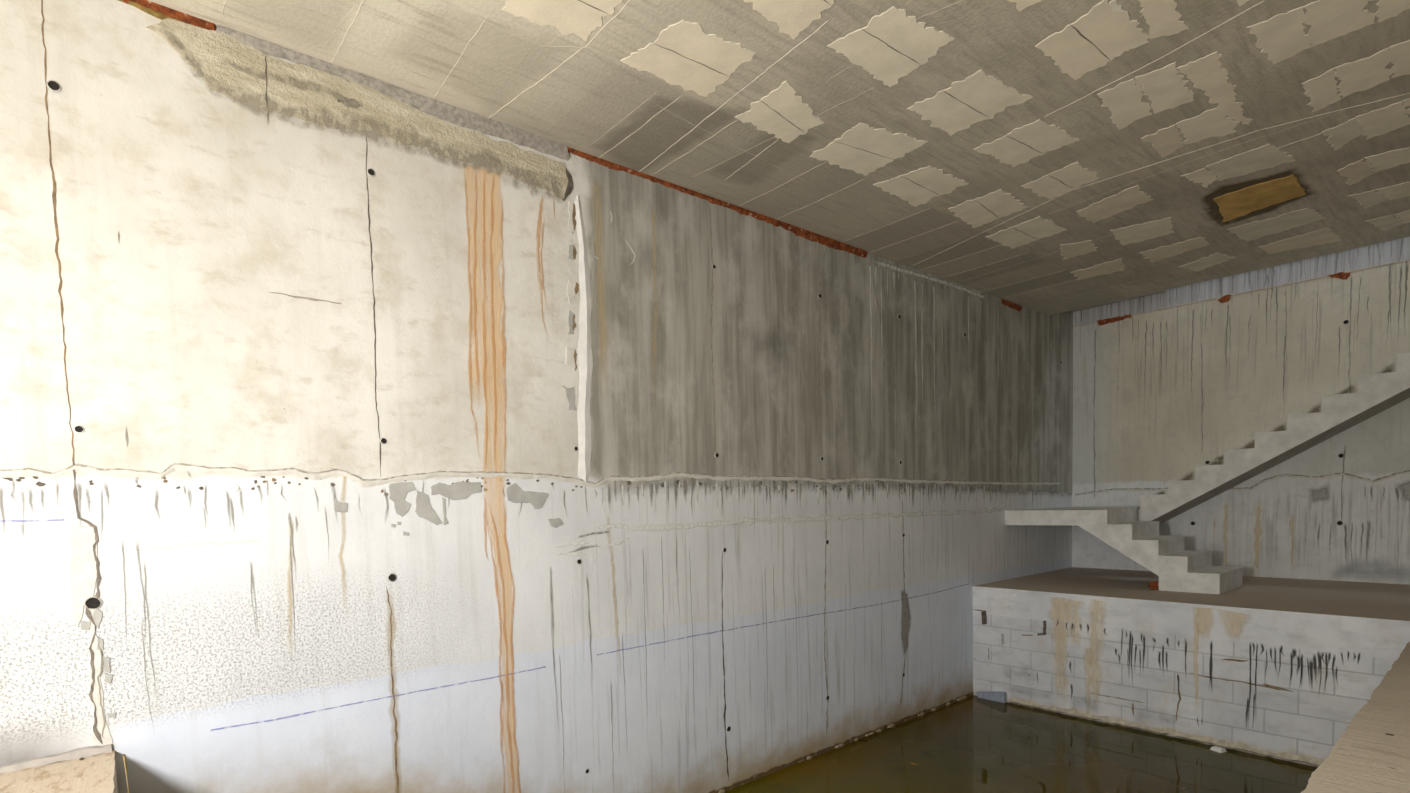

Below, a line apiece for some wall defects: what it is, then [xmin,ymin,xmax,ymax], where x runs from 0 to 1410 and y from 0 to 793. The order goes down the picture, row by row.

spalling [118,0,868,260]
flaking render [1329,272,1351,280]
peeling [562,310,577,410]
leakage [590,161,1082,522]
corrosion [465,164,520,793]
leakage [122,546,154,673]
leakage [1057,600,1212,696]
leakage [1246,644,1360,721]